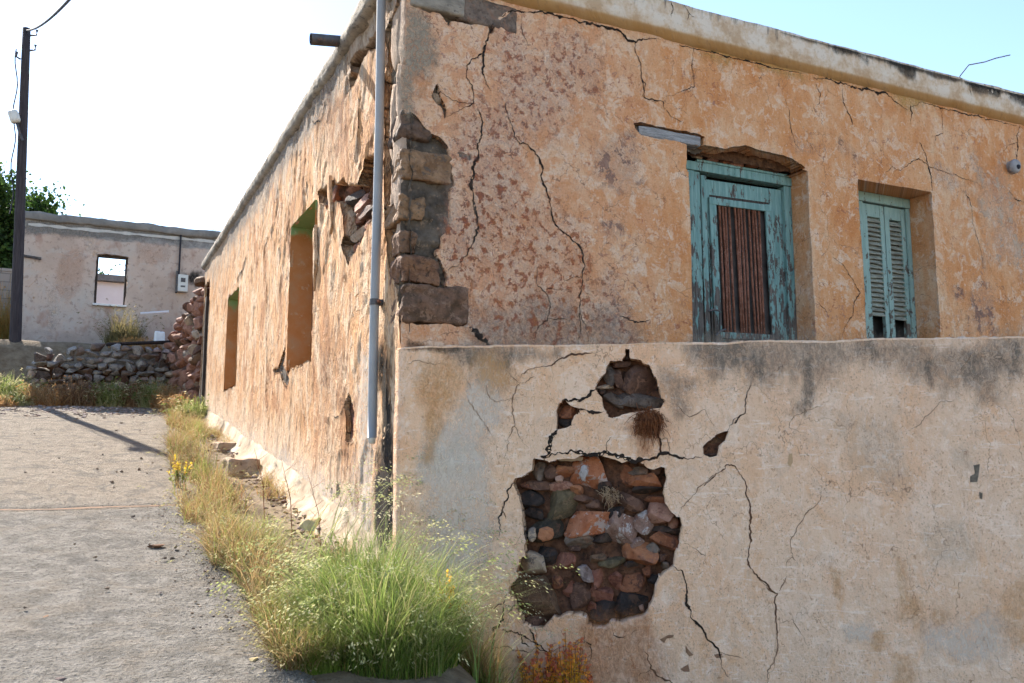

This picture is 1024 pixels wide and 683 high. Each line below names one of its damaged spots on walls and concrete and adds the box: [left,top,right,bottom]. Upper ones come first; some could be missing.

spalling [313,168,374,291]
spalling [384,0,681,626]
crack [437,10,1024,683]
spalling [336,386,355,440]
spalling [703,432,727,457]
spalling [970,464,983,499]